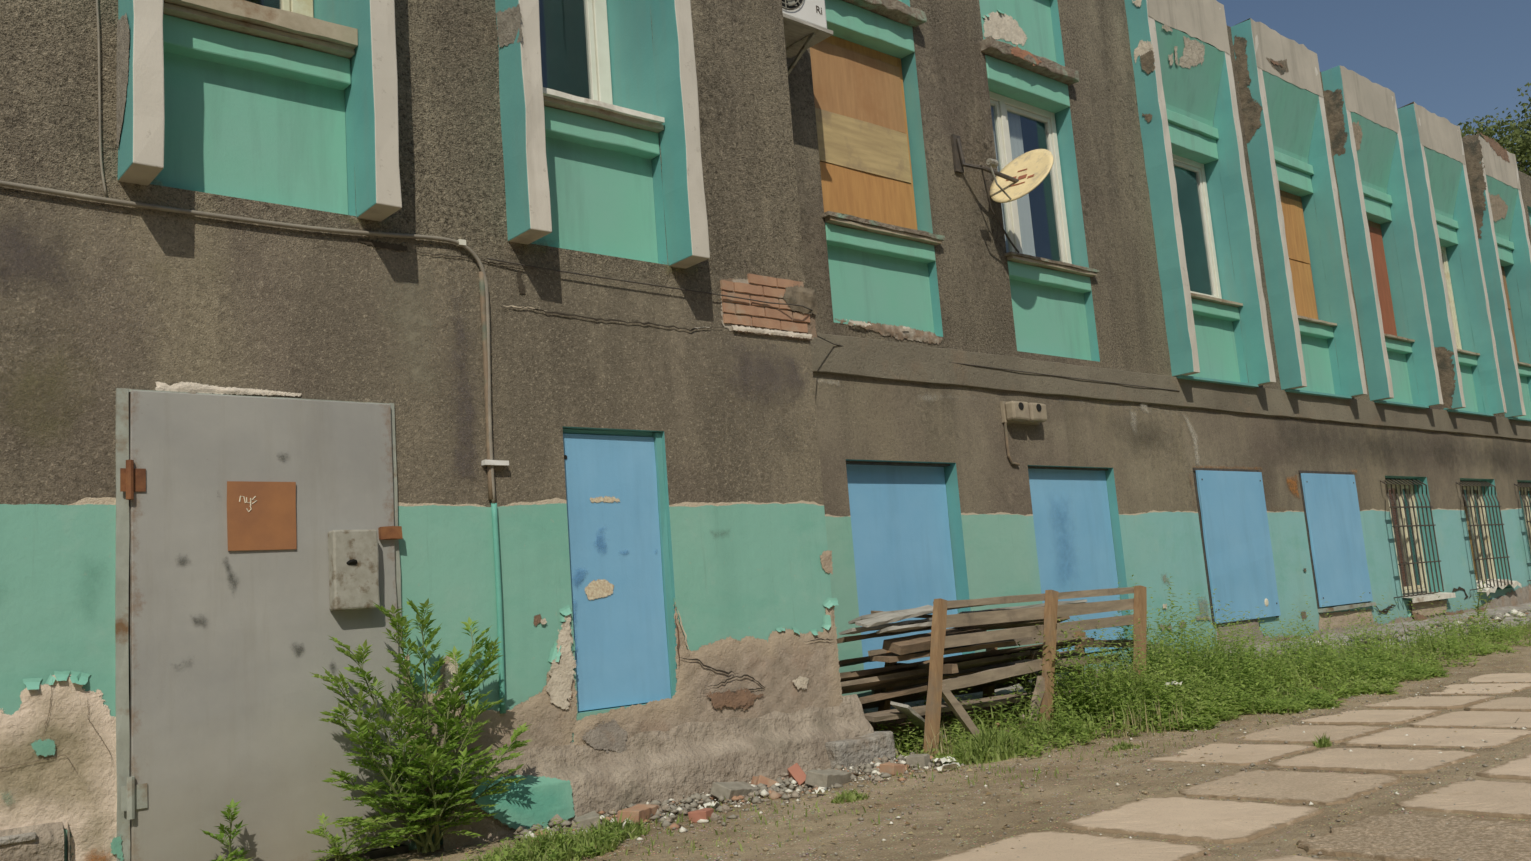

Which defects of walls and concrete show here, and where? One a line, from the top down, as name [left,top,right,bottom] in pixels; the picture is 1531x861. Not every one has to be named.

peeling [982,9,1041,66]
peeling [1134,24,1205,74]
peeling [1233,36,1263,143]
spalling [1266,58,1289,75]
peeling [1324,89,1362,156]
crack [501,305,723,332]
spalling [719,274,818,342]
spalling [835,317,942,345]
peeling [575,570,614,600]
peeling [403,597,843,843]
peeling [0,670,124,861]